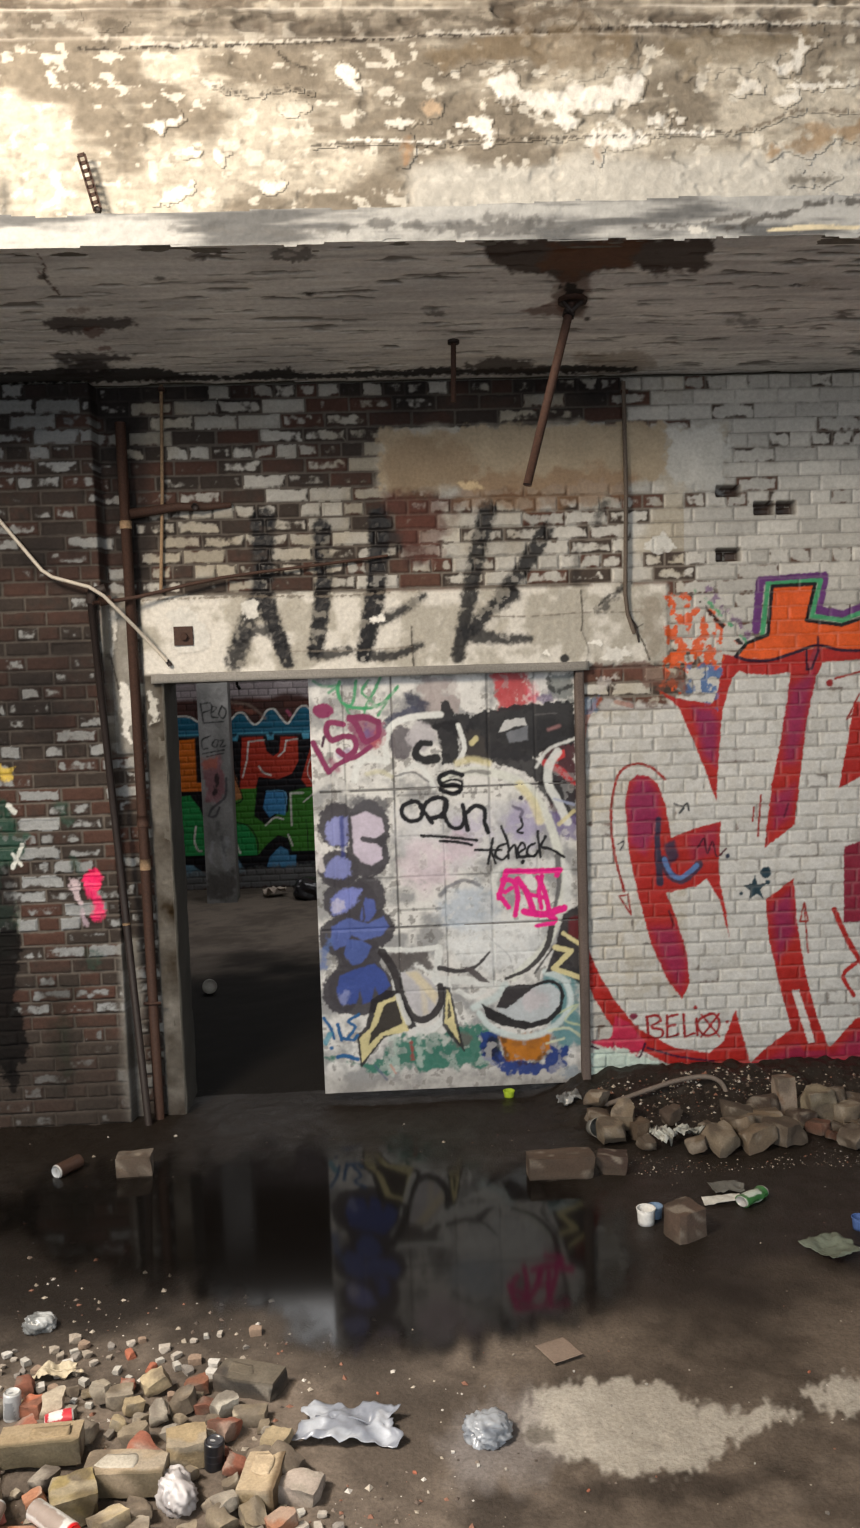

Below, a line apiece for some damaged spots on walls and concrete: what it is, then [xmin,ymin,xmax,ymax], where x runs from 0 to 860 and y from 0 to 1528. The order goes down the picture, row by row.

peeling [334,60,362,93]
peeling [728,33,860,109]
peeling [151,109,187,137]
peeling [276,99,312,118]
peeling [383,68,687,152]
peeling [151,179,196,207]
peeling [257,177,288,196]
corrosion [480,237,719,323]
corrosion [568,345,664,376]
peeling [643,530,678,556]